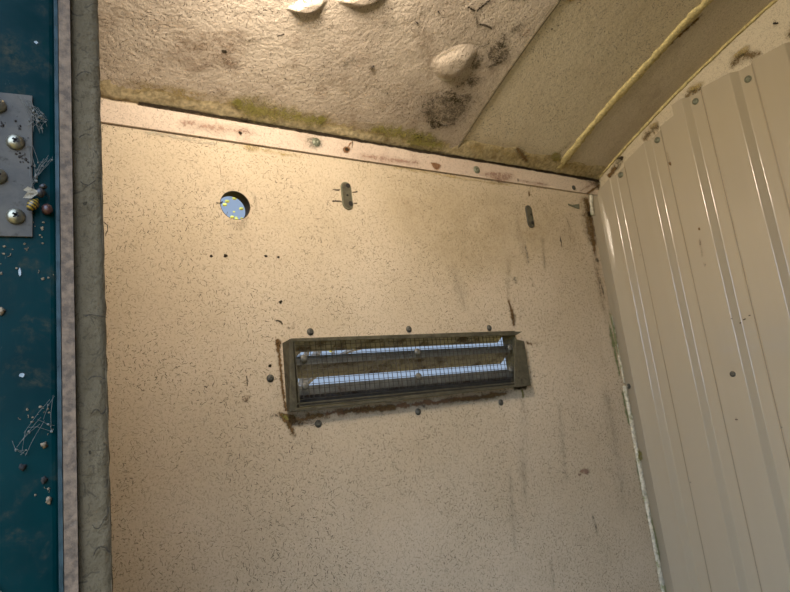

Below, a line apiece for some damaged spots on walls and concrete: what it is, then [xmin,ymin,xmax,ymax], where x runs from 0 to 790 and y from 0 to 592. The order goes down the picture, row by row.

leakage [417,24,530,129]
leakage [731,48,760,66]
leakage [561,156,623,310]
rust [323,386,527,419]